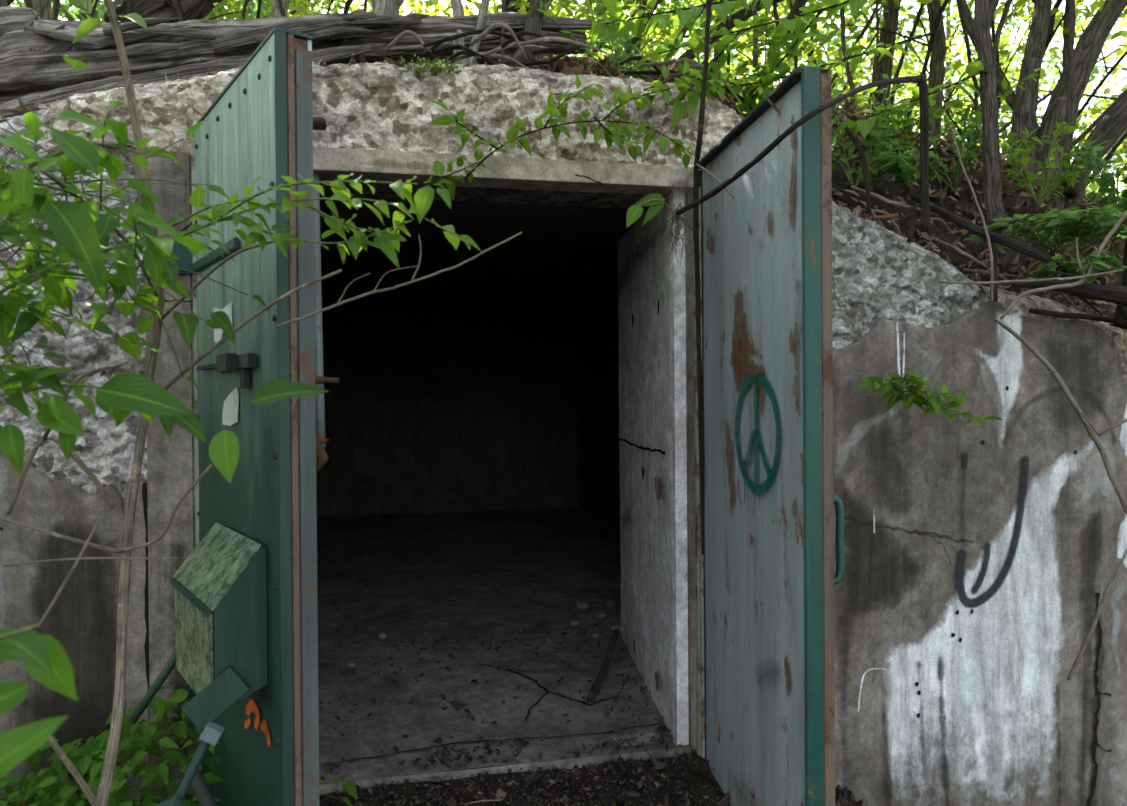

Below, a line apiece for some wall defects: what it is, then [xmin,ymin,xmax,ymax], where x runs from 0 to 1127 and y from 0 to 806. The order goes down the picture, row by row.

spalling [312,61,744,167]
spalling [0,66,242,500]
rust [730,289,765,414]
spalling [832,201,1127,379]
crack [611,437,665,455]
damp [20,526,117,800]
crack [326,664,663,764]
damp [841,490,917,689]
crack [835,514,973,564]
damp [883,456,1077,806]
damp [1082,515,1124,806]
damp [1118,515,1127,567]